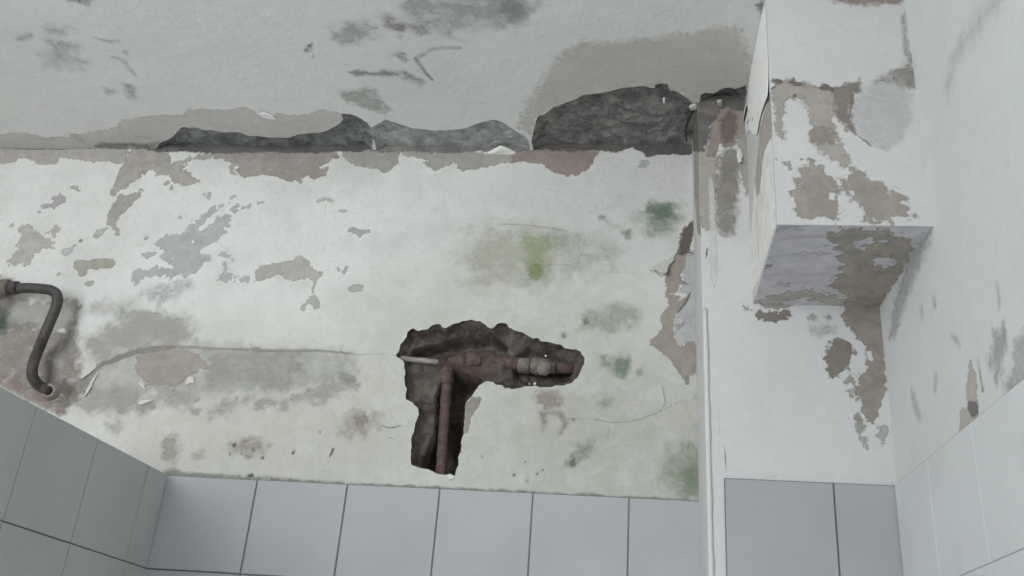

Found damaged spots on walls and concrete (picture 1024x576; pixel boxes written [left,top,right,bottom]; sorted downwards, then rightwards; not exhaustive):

spalling [0,3,861,384]
spalling [396,320,585,480]